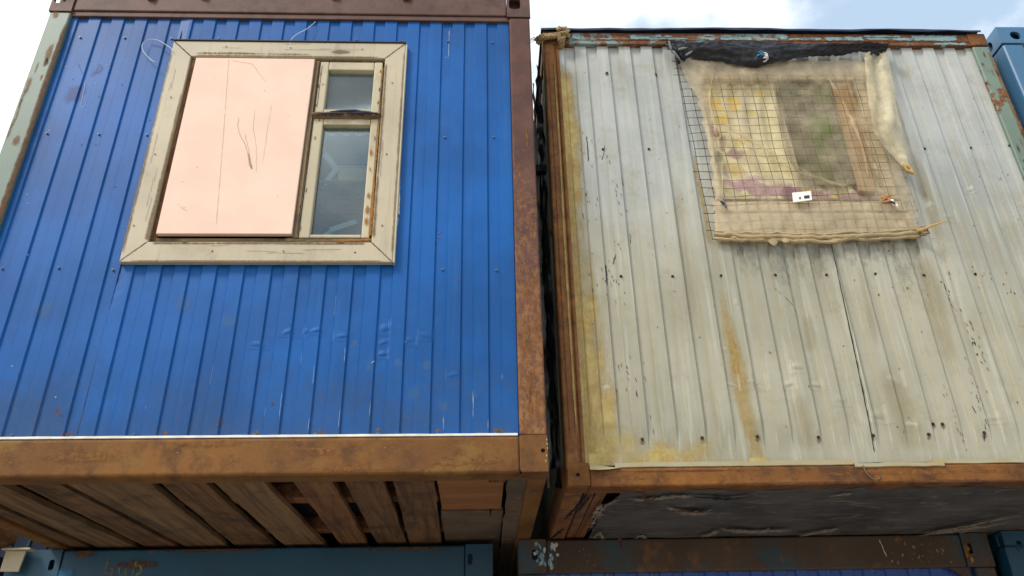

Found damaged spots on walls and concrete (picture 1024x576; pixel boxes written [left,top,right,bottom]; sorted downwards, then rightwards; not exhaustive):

corrosion [333,70,383,241]
corrosion [548,63,723,479]
crack [831,245,877,450]